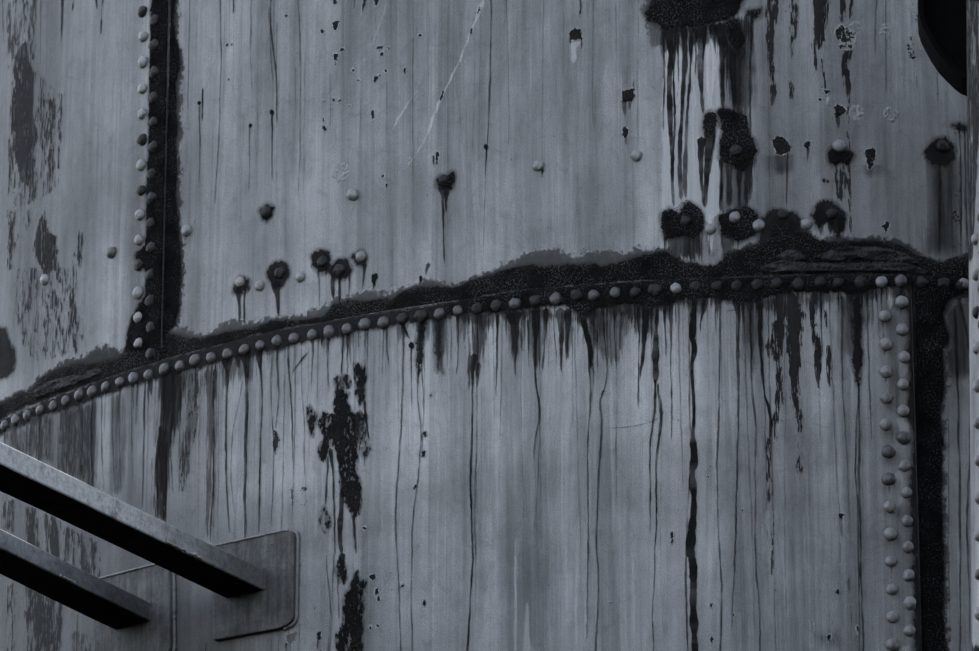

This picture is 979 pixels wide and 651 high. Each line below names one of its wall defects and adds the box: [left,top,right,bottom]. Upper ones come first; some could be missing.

corrosion [569,0,583,47]
corrosion [621,82,635,103]
corrosion [435,171,455,262]
corrosion [772,135,791,179]
corrosion [827,148,854,201]
corrosion [864,147,876,170]
corrosion [924,122,968,250]
corrosion [0,328,16,379]
corrosion [589,357,608,480]
corrosion [719,331,740,590]
corrosion [587,428,599,597]
corrosion [958,463,970,550]